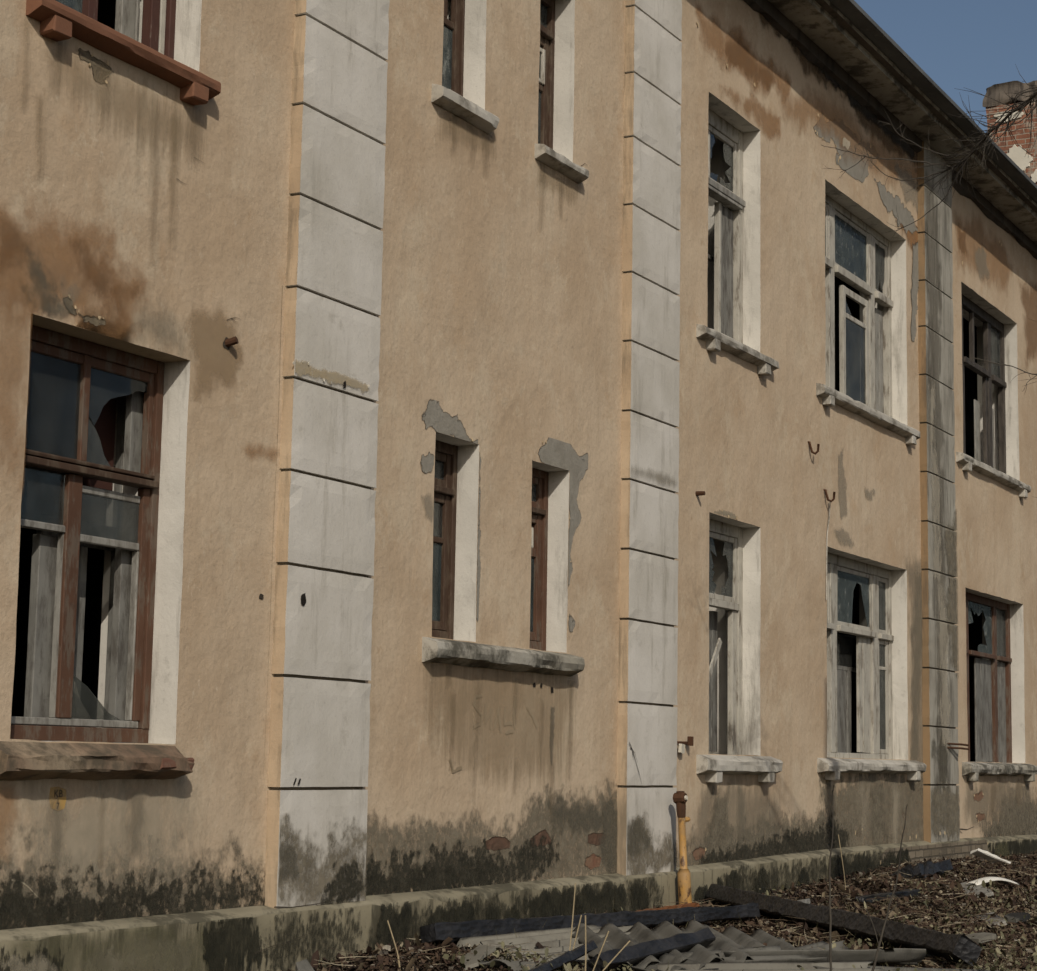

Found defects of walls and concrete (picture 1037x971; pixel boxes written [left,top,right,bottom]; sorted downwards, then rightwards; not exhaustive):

flaking render [78,48,112,84]
water stain [697,8,790,136]
peeling [813,114,919,234]
water stain [0,214,140,329]
flaking render [63,294,106,326]
peeling [293,359,370,392]
peeling [420,452,435,473]
peeling [422,399,478,444]
peeling [538,437,588,585]
water stain [945,511,959,678]
water stain [0,784,265,930]
water stain [278,740,960,907]